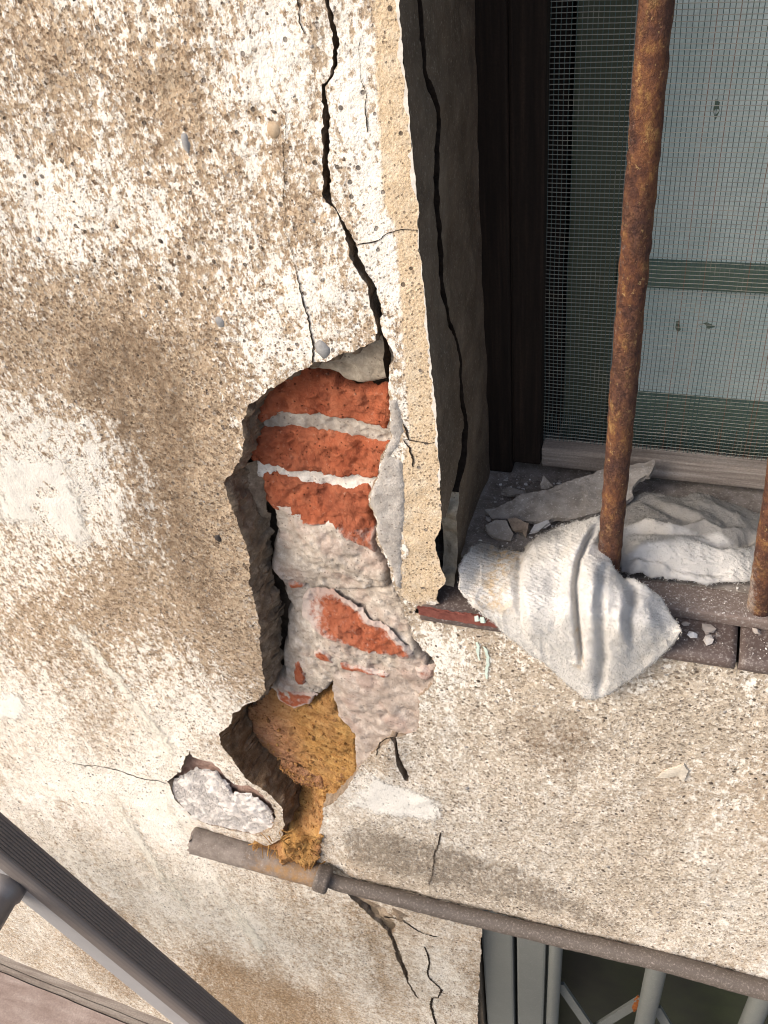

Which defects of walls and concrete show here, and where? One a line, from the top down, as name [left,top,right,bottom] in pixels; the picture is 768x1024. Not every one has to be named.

crack [283,112,314,363]
crack [321,0,468,602]
spalling [167,315,436,843]
crack [376,731,409,781]
crack [348,894,443,1024]